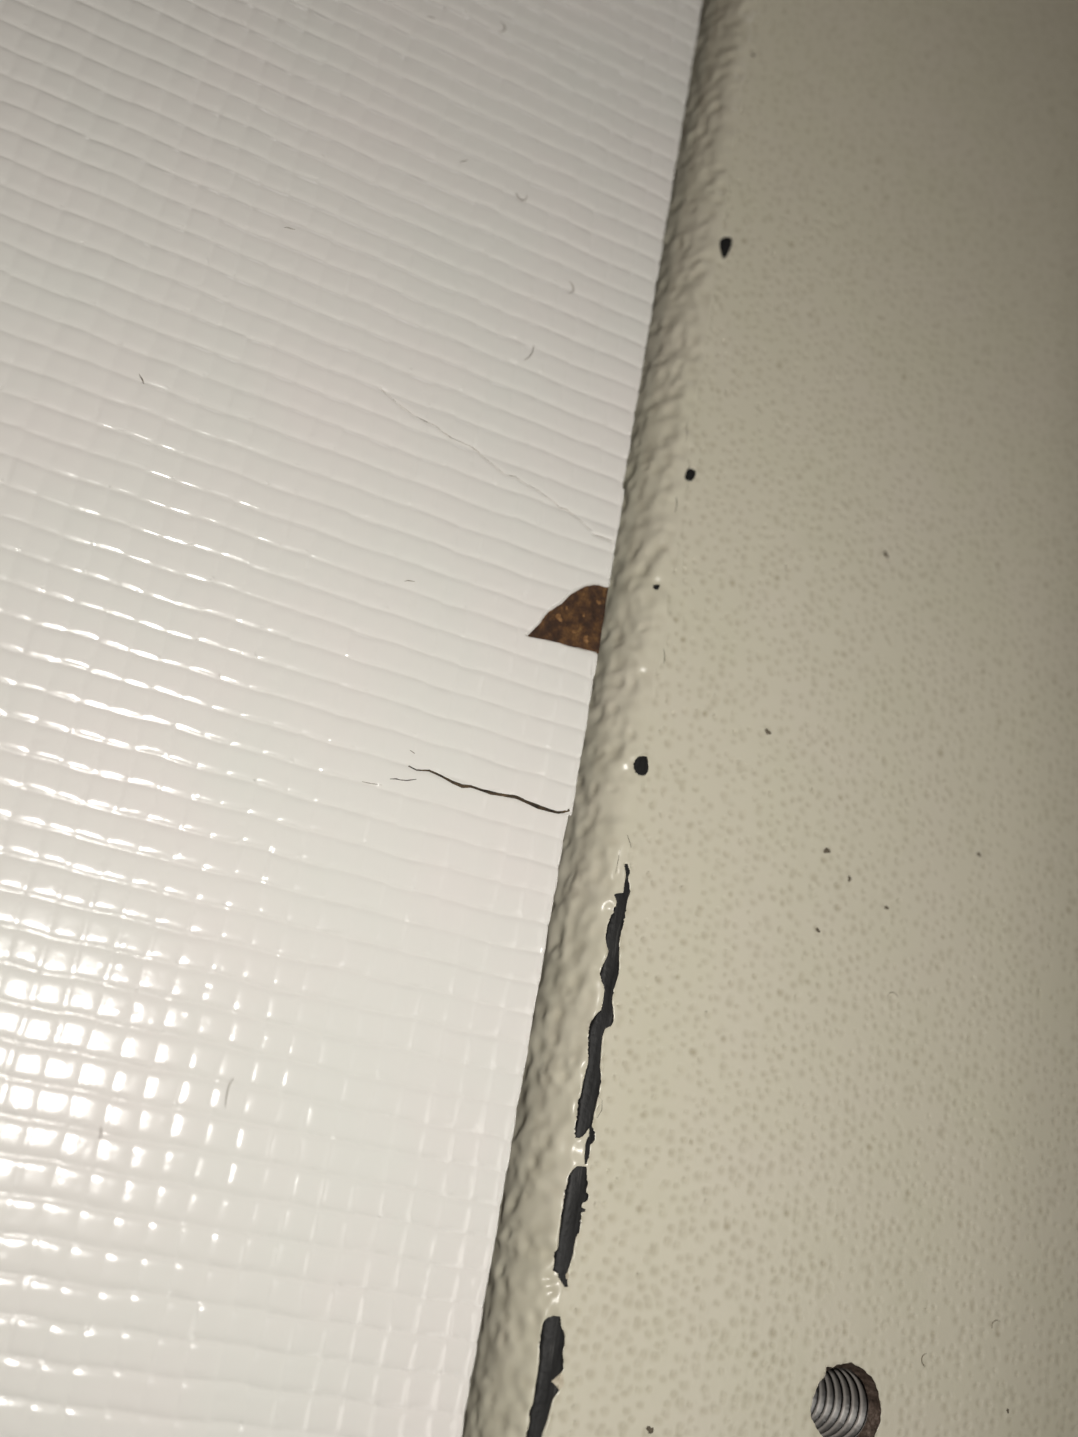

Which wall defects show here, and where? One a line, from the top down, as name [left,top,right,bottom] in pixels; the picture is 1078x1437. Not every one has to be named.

corrosion [528,585,609,654]
crack [362,750,570,814]
peeling [553,864,630,1287]
peeling [526,1316,565,1437]